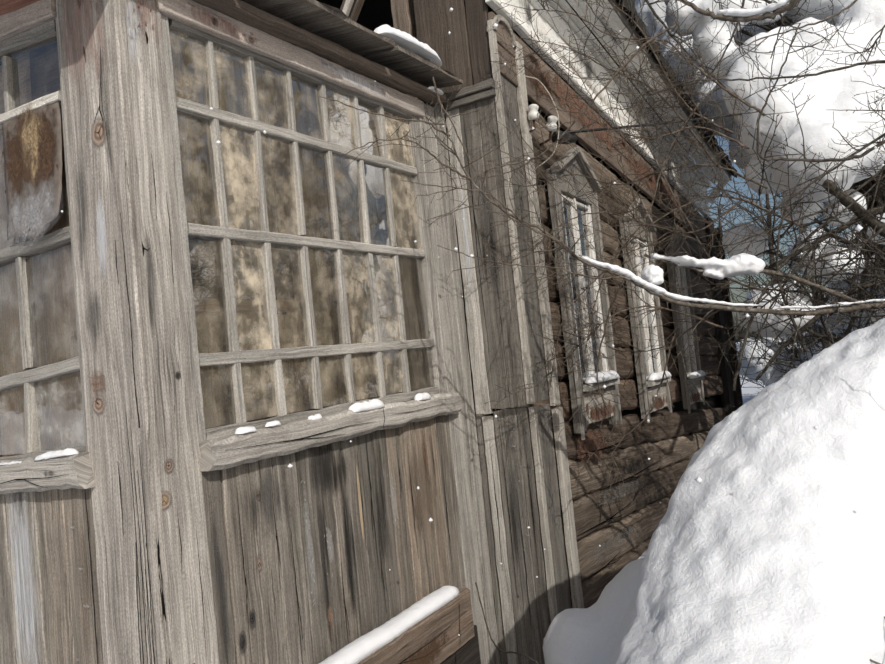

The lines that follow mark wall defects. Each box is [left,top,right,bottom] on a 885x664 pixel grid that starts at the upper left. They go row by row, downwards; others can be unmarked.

corrosion [2,108,56,203]
crack [83,46,110,156]
crack [151,153,173,273]
crack [115,213,206,664]